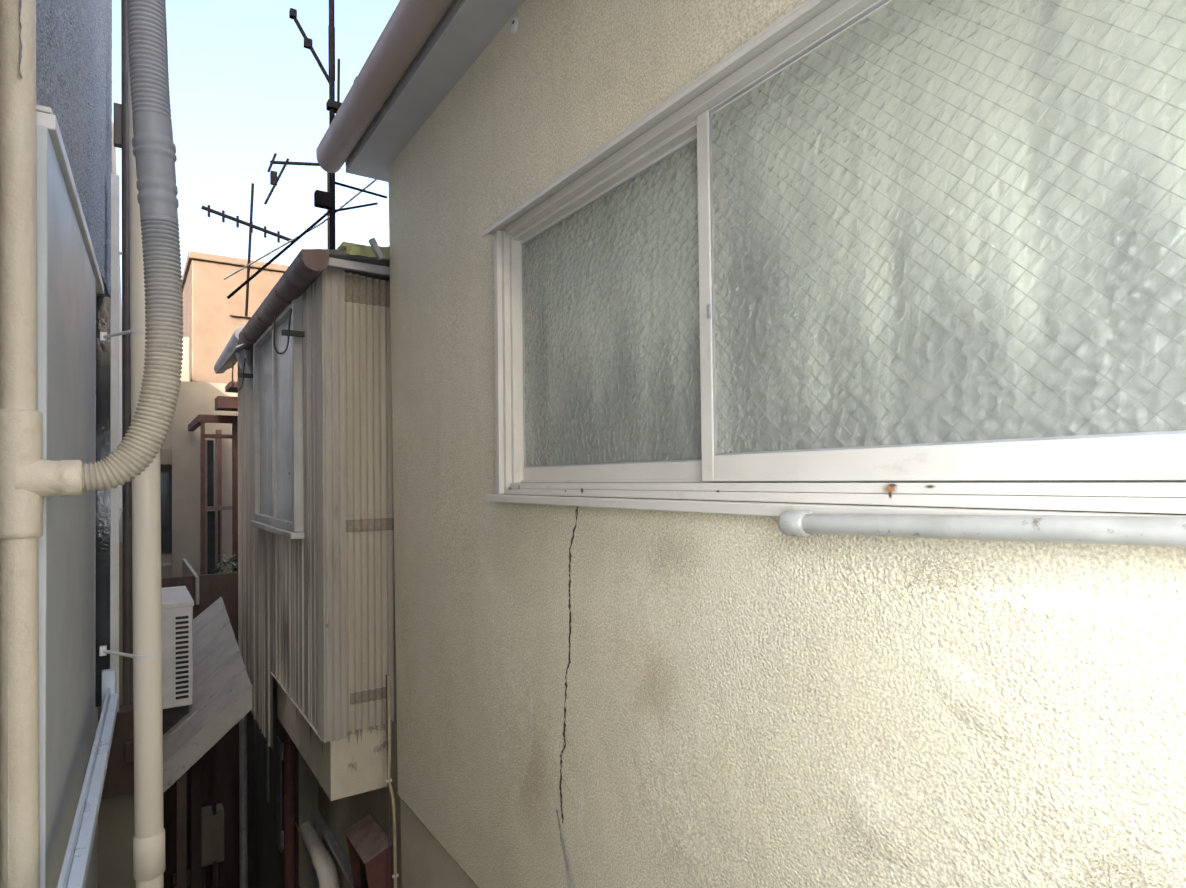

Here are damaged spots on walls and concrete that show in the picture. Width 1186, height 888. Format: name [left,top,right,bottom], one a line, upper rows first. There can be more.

crack [559,506,578,823]